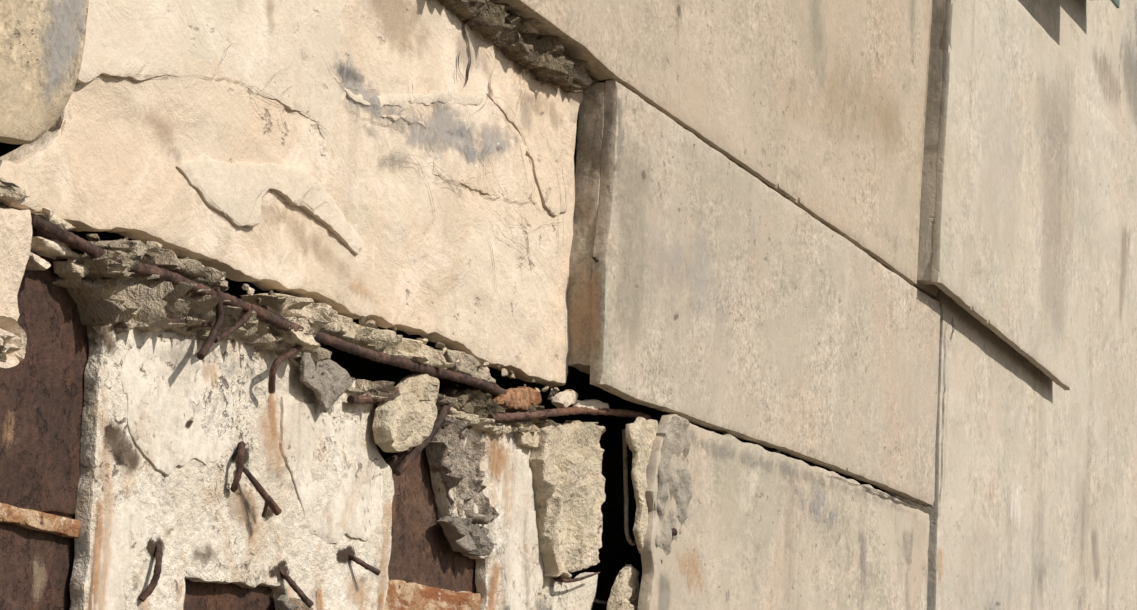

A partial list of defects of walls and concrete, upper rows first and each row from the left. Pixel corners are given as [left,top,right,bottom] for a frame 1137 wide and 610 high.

spalling [0,177,30,209]
crack [136,43,325,129]
crack [192,174,331,226]
peeling [176,154,364,255]
peeling [76,0,598,216]
damp [339,63,507,160]
crack [326,10,568,307]
corrosion [31,214,507,396]
spalling [25,207,560,610]
corrosion [487,406,652,422]